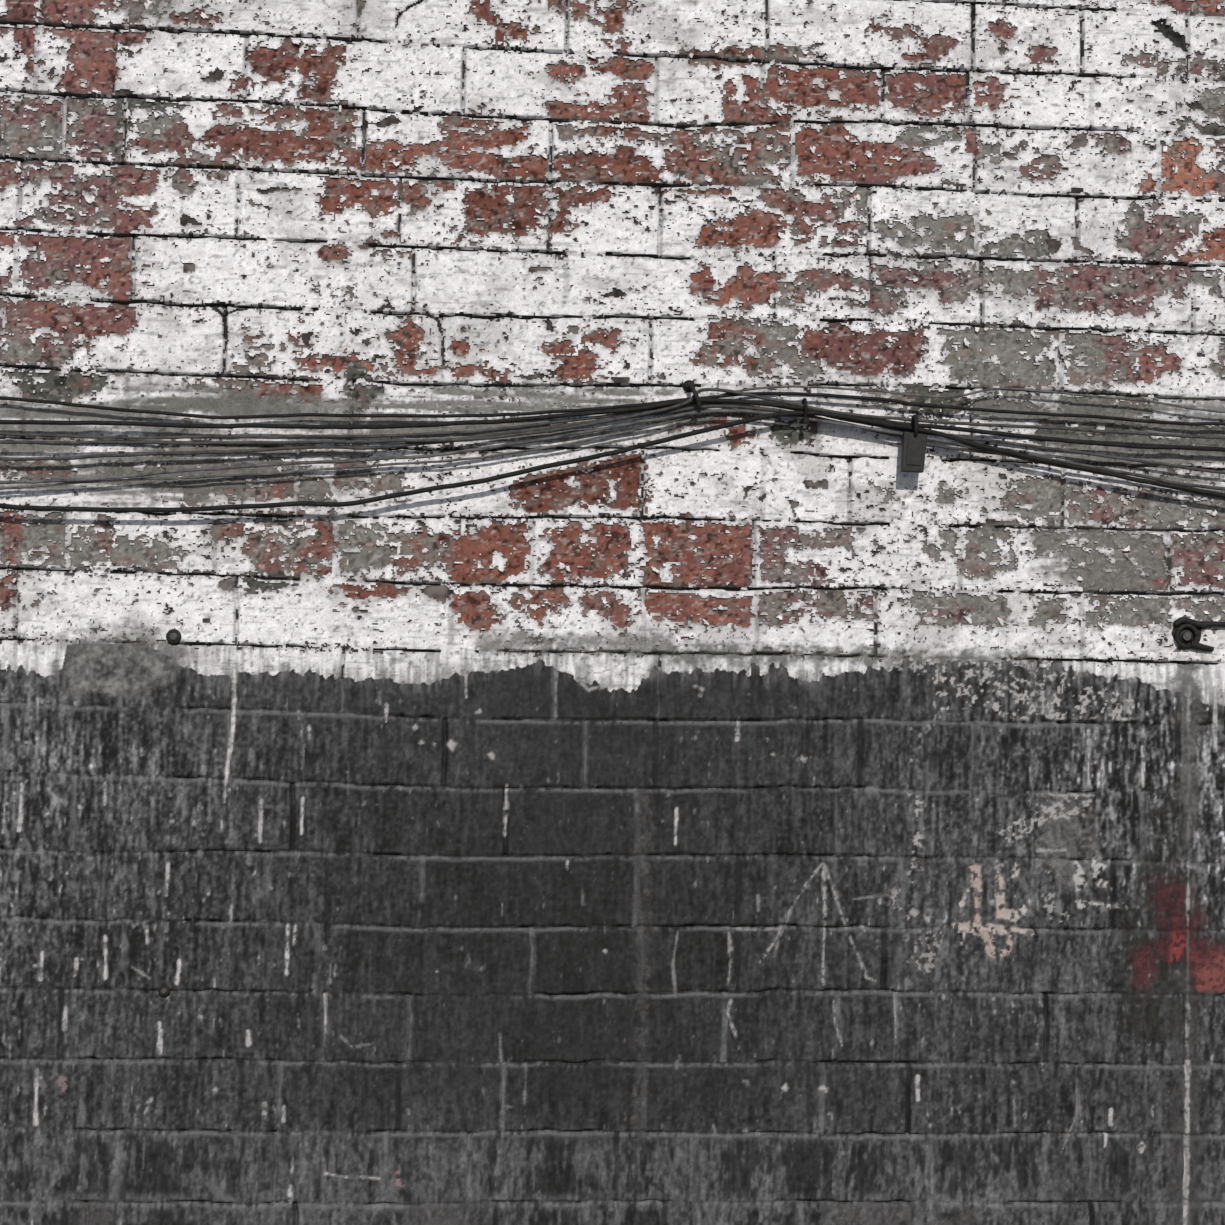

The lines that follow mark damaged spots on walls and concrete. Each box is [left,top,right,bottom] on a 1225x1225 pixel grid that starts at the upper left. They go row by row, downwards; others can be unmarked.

leakage [1183,1060,1191,1225]